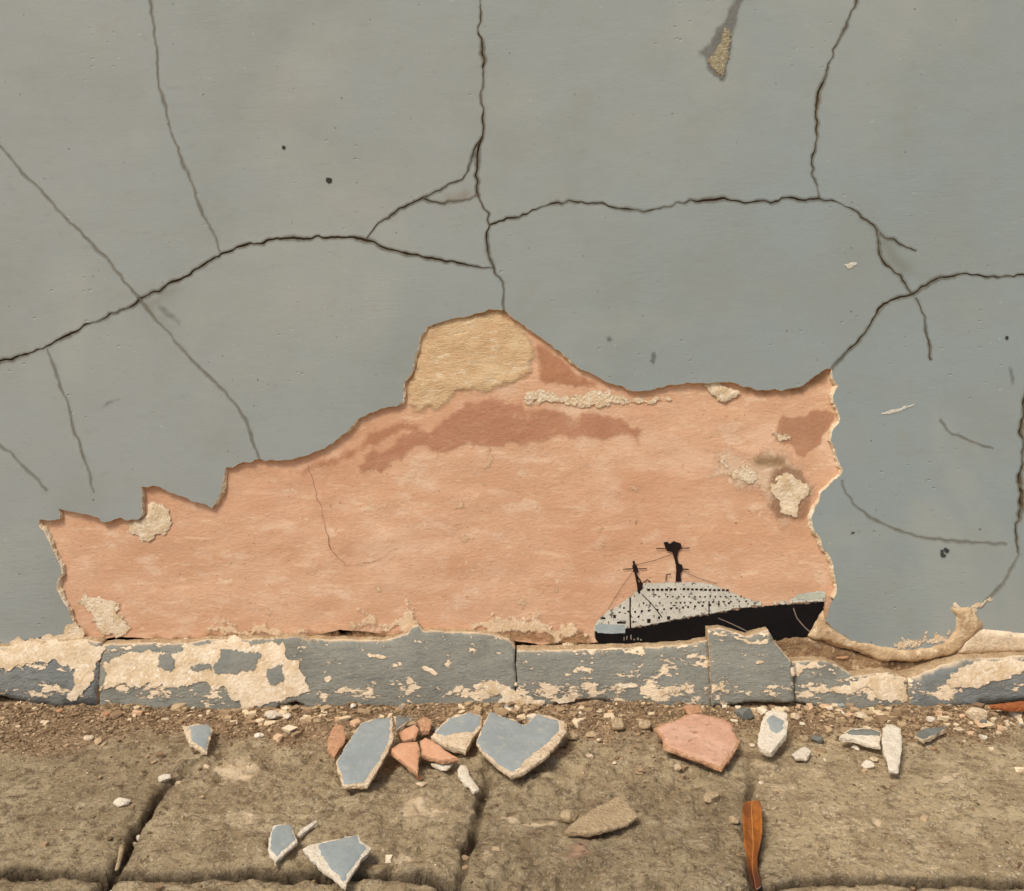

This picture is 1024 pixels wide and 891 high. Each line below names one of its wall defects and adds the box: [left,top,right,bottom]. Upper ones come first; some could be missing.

peeling [702,0,741,80]
crack [0,0,1024,483]
crack [307,464,392,566]
flaking render [0,309,843,710]
crack [842,397,1024,598]
peeling [790,661,907,703]
peeling [946,657,1024,689]